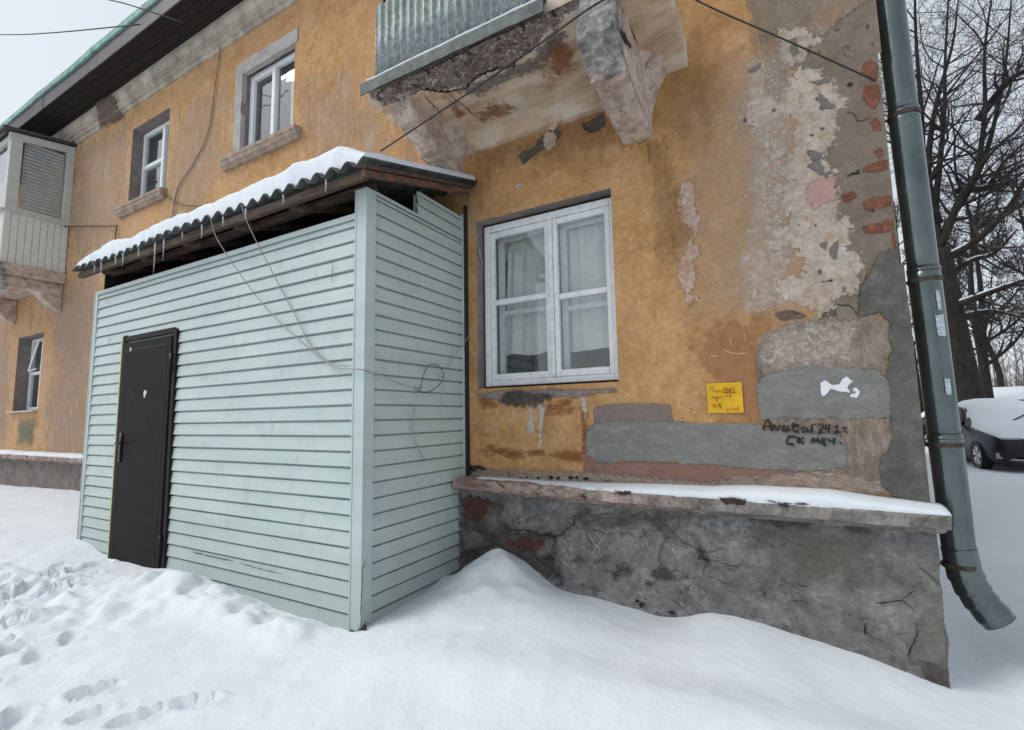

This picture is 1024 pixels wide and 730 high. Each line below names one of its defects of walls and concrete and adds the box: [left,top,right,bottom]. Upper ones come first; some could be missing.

spalling [368,0,579,107]
corrosion [549,41,573,75]
corrosion [479,105,514,121]
spalling [518,127,561,164]
spalling [582,113,605,133]
peeling [734,0,900,368]
peeling [675,180,702,307]
damp [499,390,551,447]
crack [461,514,577,587]
crack [864,591,918,658]